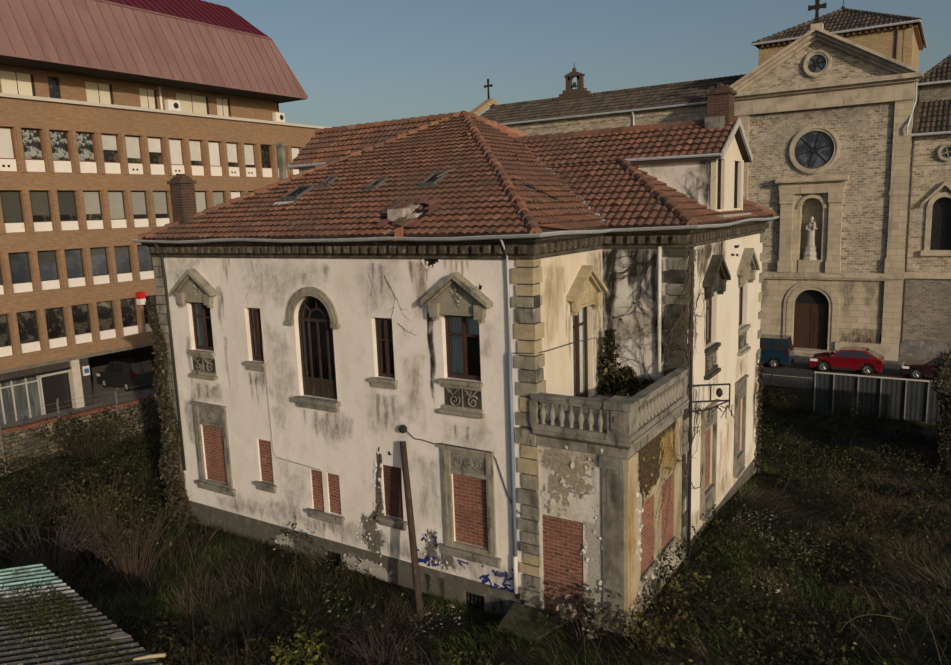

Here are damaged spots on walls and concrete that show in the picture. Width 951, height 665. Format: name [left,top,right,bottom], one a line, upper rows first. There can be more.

leakage [427,311,435,390]
flaking render [343,451,394,583]
flaking render [536,446,603,606]
flaking render [634,429,665,565]